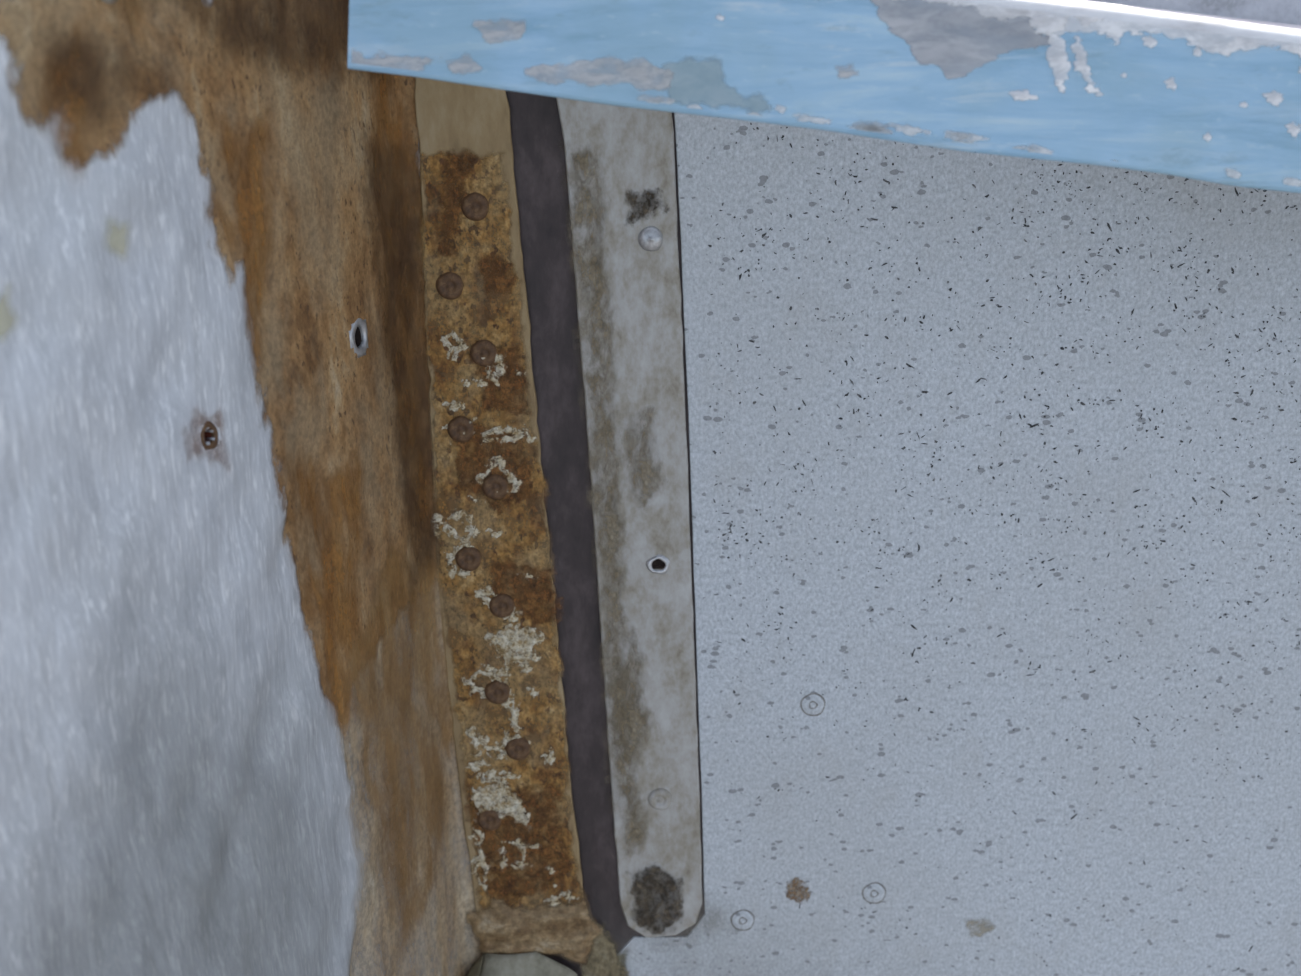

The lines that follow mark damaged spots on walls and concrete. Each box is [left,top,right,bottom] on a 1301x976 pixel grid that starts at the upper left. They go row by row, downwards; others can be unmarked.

peeling [872,0,1301,96]
peeling [525,57,831,124]
peeling [1009,90,1039,101]
peeling [1262,91,1284,106]
peeling [851,122,987,144]
rust [0,0,583,910]
rust [786,878,810,902]